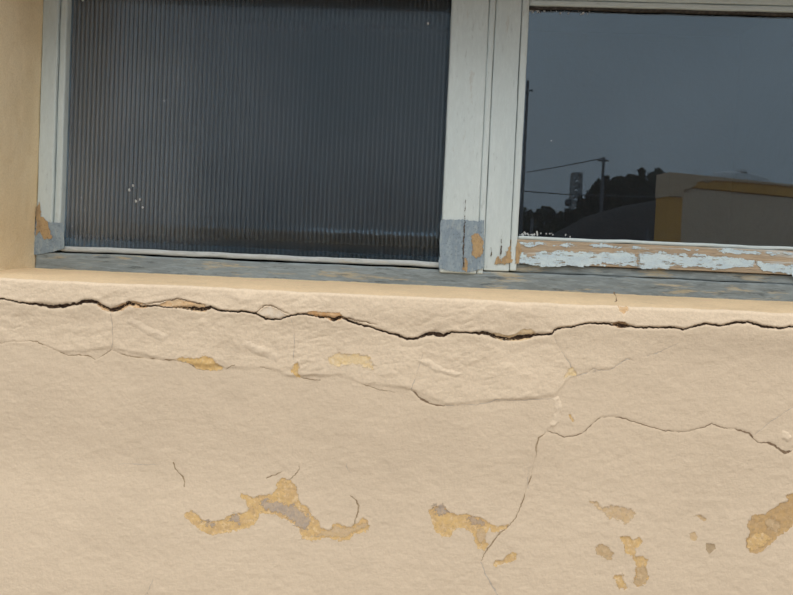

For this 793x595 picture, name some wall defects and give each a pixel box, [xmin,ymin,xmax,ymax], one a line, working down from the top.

peeling [462,233,484,272]
peeling [177,355,223,371]
crack [0,298,793,406]
crack [619,407,793,454]
peeling [184,478,369,542]
peeling [428,503,508,551]
crack [481,418,599,595]
peeling [589,501,635,525]
peeling [746,494,793,554]
peeling [595,544,614,560]
peeling [613,536,649,590]